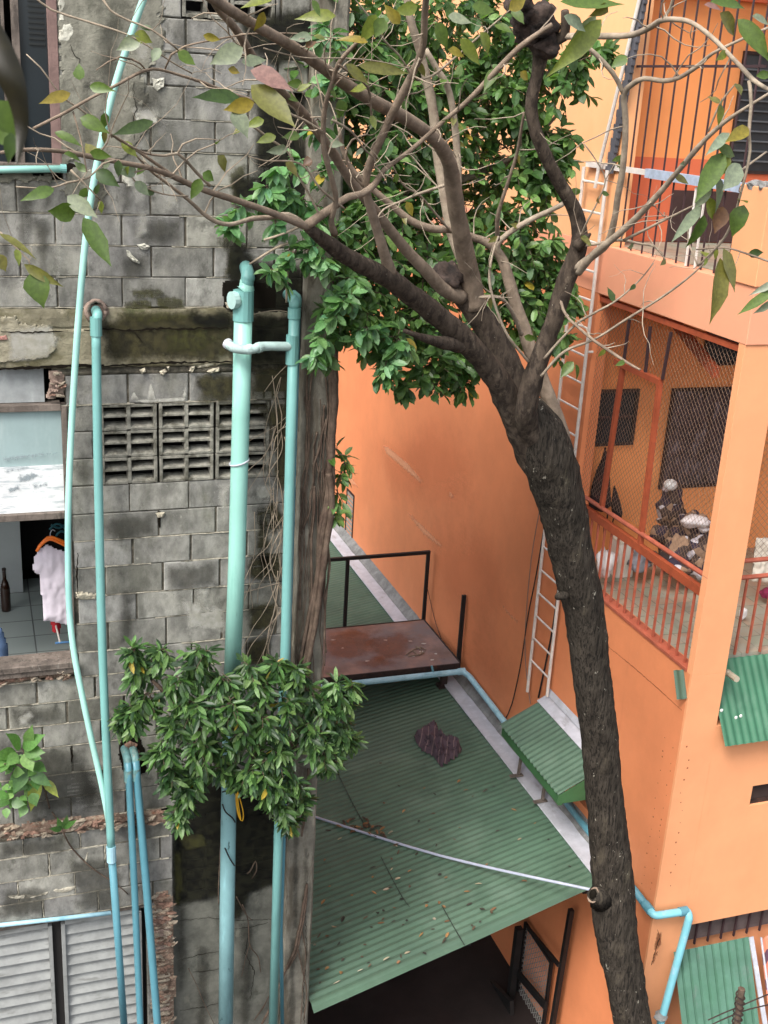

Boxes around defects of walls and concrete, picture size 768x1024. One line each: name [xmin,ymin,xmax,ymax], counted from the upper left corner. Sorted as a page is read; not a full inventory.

flaking render [0,315,58,363]